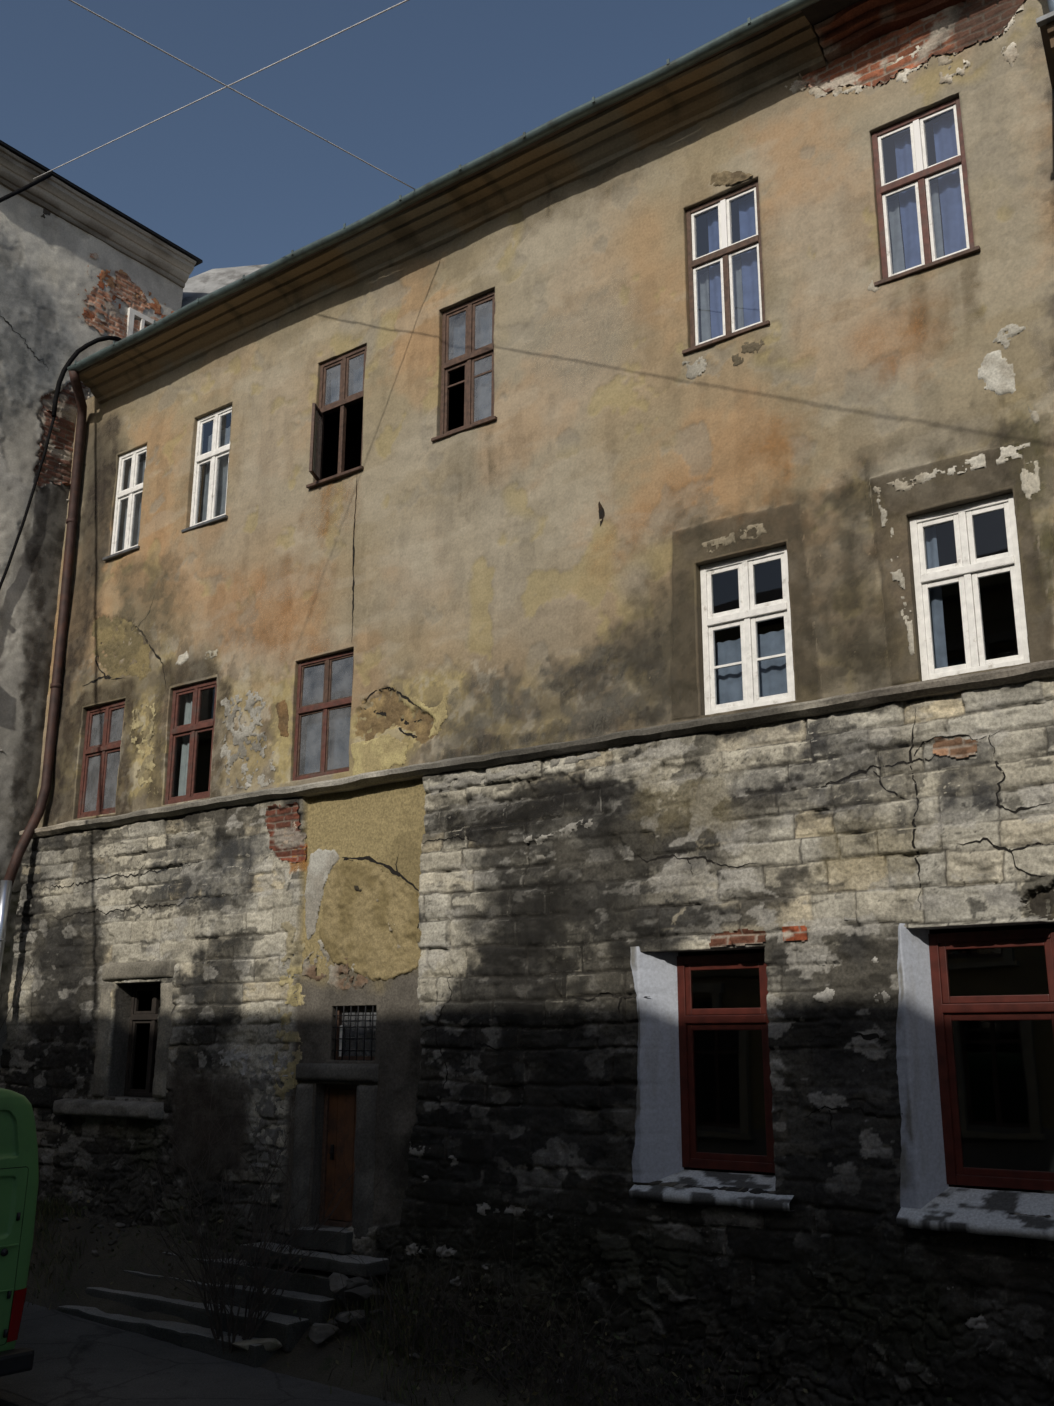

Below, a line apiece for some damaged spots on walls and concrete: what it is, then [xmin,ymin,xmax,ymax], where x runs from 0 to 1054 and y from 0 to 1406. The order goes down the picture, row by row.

flaking render [785,0,1027,99]
flaking render [78,253,174,339]
peeling [978,324,1026,396]
water stain [88,417,122,531]
peeling [873,442,1041,537]
crack [84,601,166,687]
flaking render [351,687,448,776]
water stain [447,780,611,841]
crack [812,709,1054,908]
crack [11,859,231,920]
crack [342,835,482,891]
peeling [218,802,368,1169]